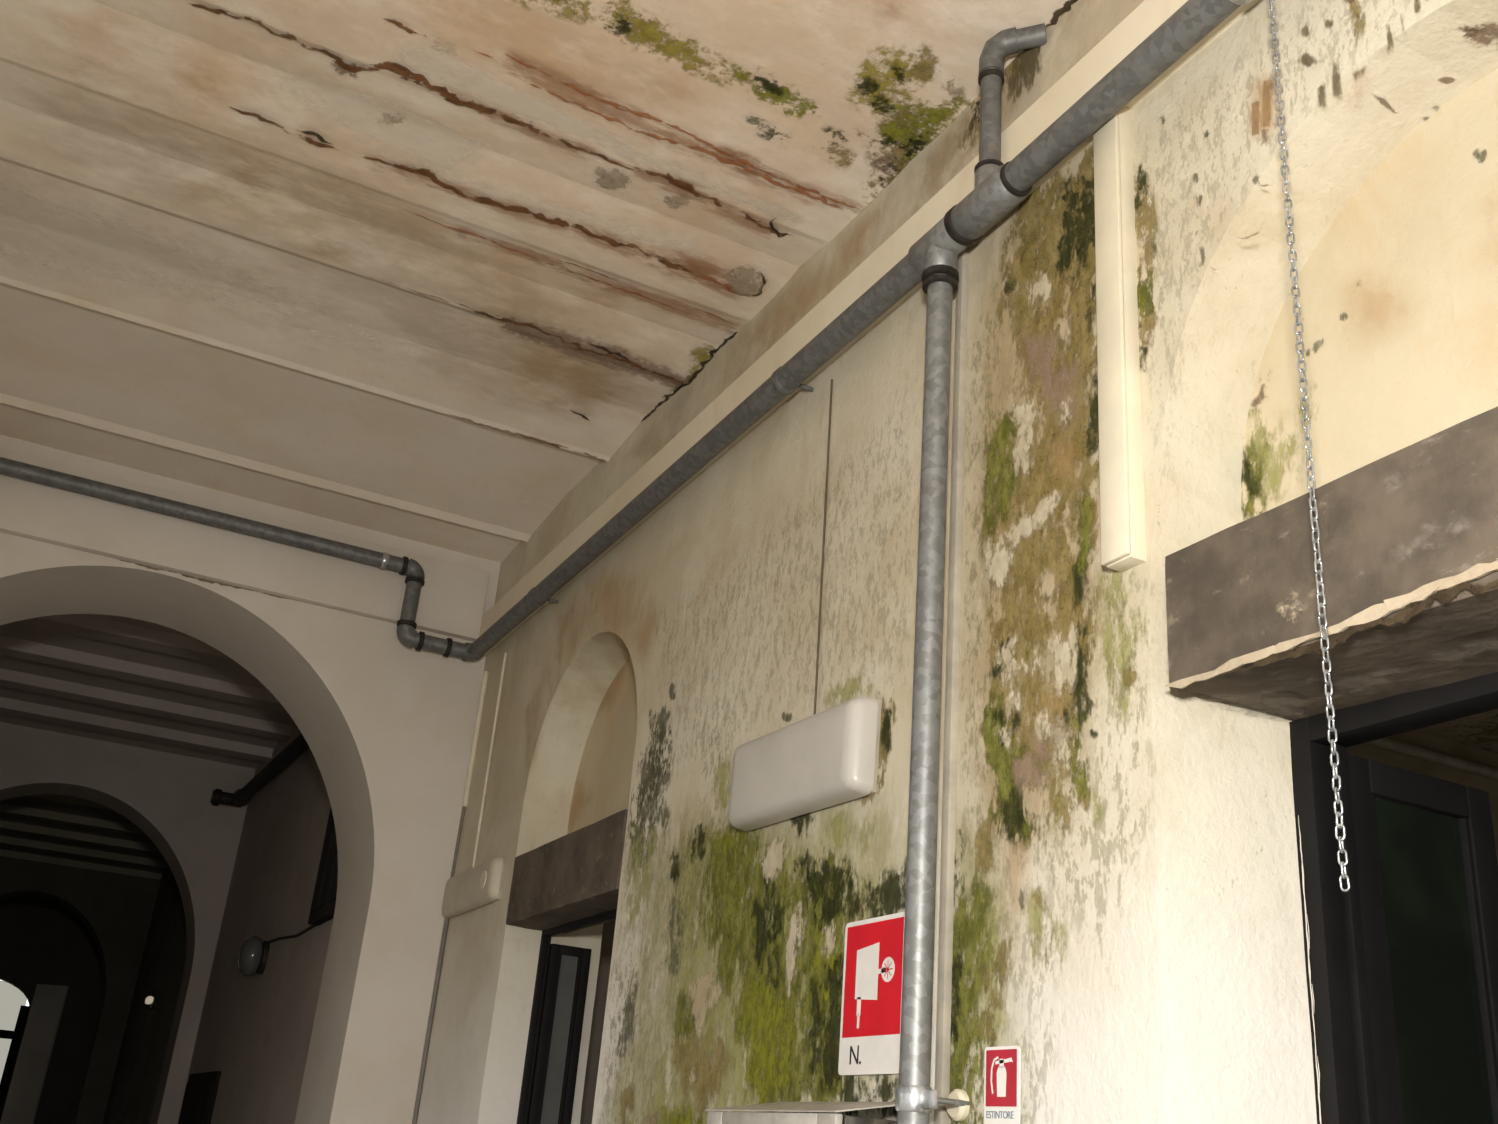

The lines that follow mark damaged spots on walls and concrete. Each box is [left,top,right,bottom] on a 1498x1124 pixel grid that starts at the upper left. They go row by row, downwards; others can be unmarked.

crack [1045,0,1078,27]
leakage [747,116,782,140]
leakage [825,80,980,198]
crack [188,3,856,422]
leakage [1099,570,1145,714]
leakage [825,678,895,804]
leakage [626,684,675,924]
leakage [665,901,685,974]
leakage [618,975,637,1061]